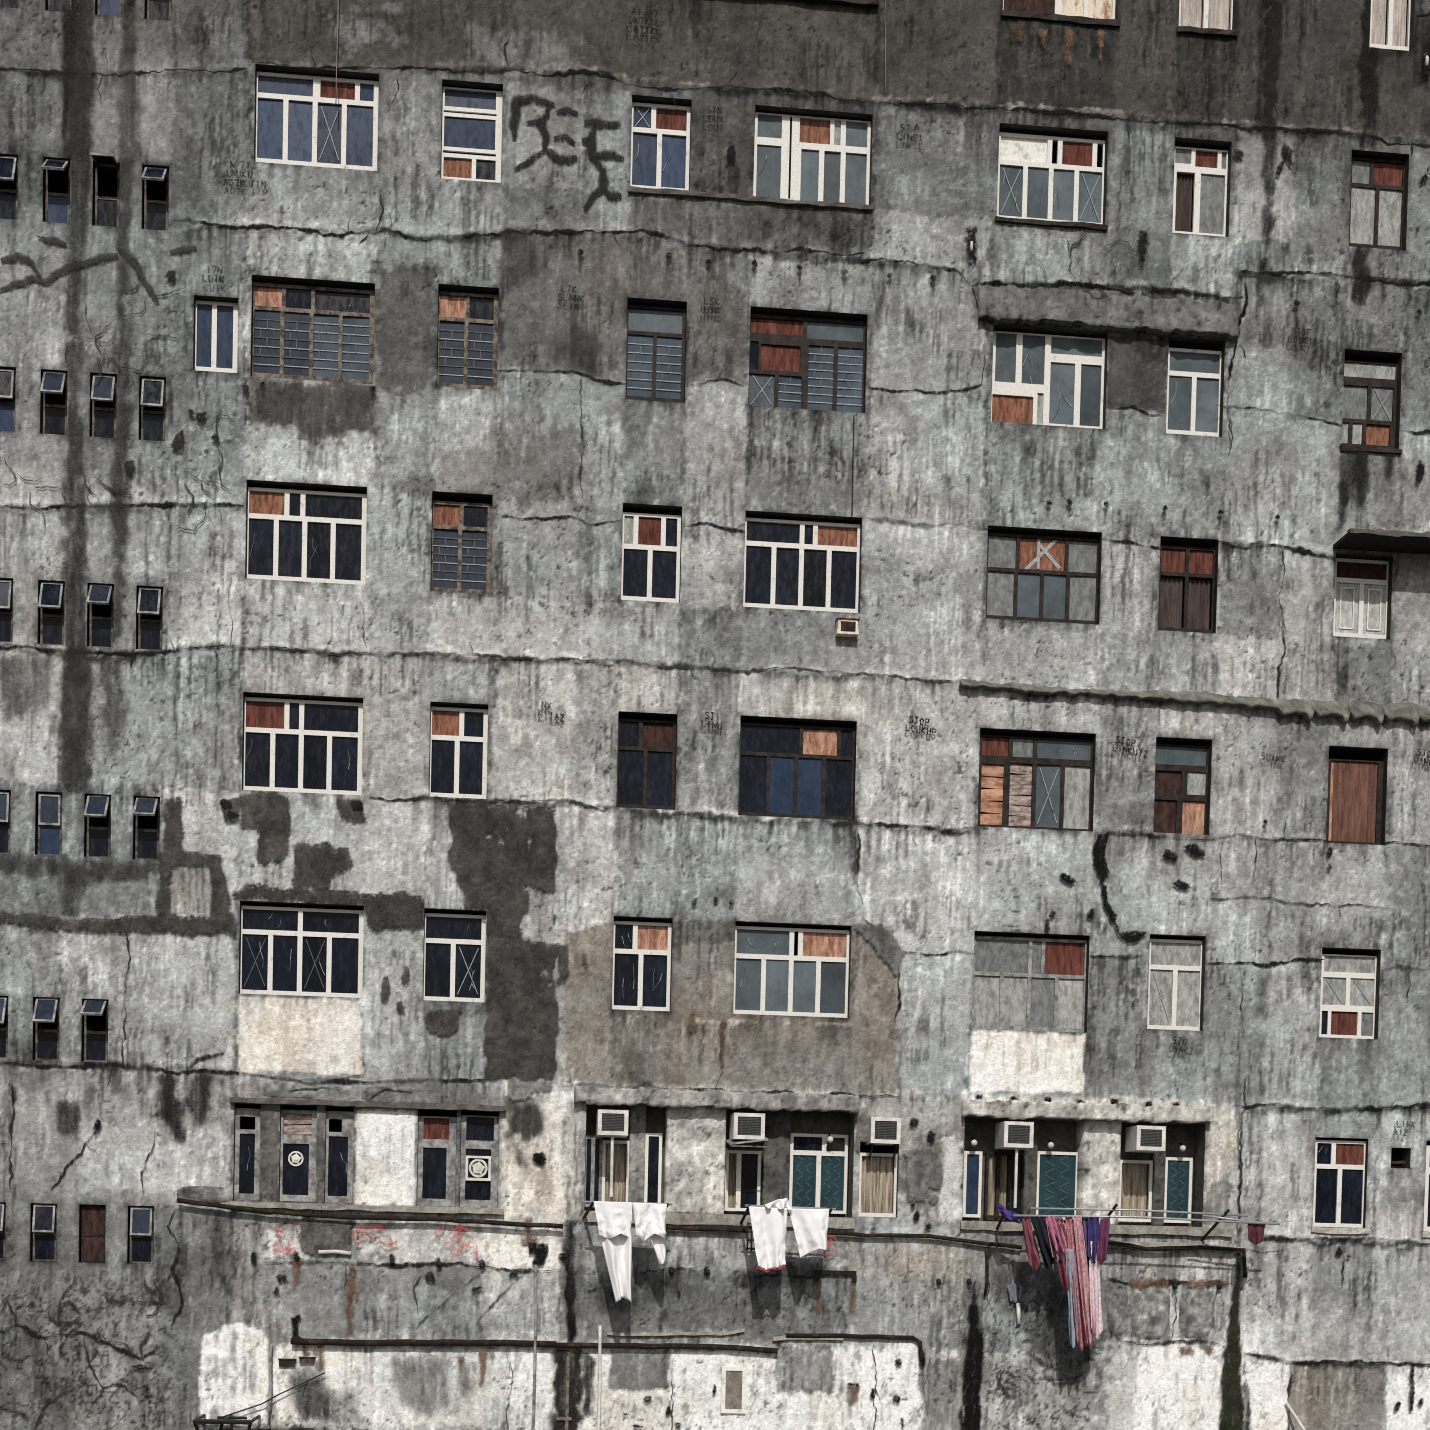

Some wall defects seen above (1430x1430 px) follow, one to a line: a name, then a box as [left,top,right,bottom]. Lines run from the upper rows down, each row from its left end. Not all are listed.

leakage [0,0,127,792]
leakage [109,0,138,633]
crack [0,36,1430,456]
leakage [1255,0,1283,266]
leakage [1219,1226,1251,1430]